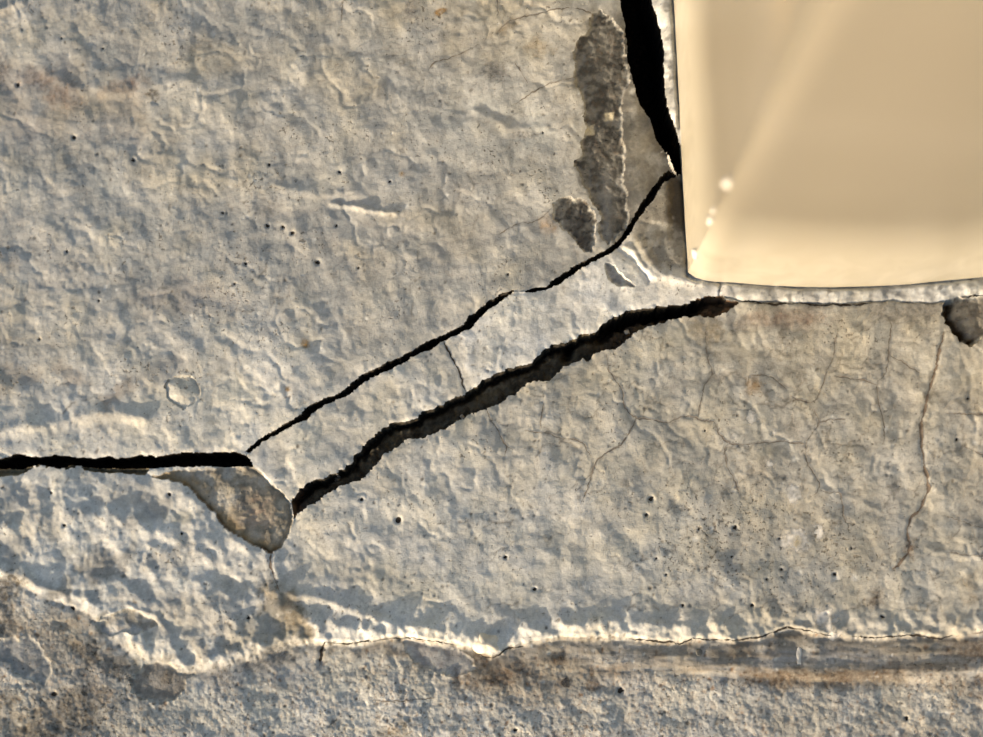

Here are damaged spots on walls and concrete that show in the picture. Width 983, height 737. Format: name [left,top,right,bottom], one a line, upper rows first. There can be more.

spalling [552,9,631,253]
crack [0,0,983,570]
spalling [941,295,983,347]
spalling [150,465,294,554]